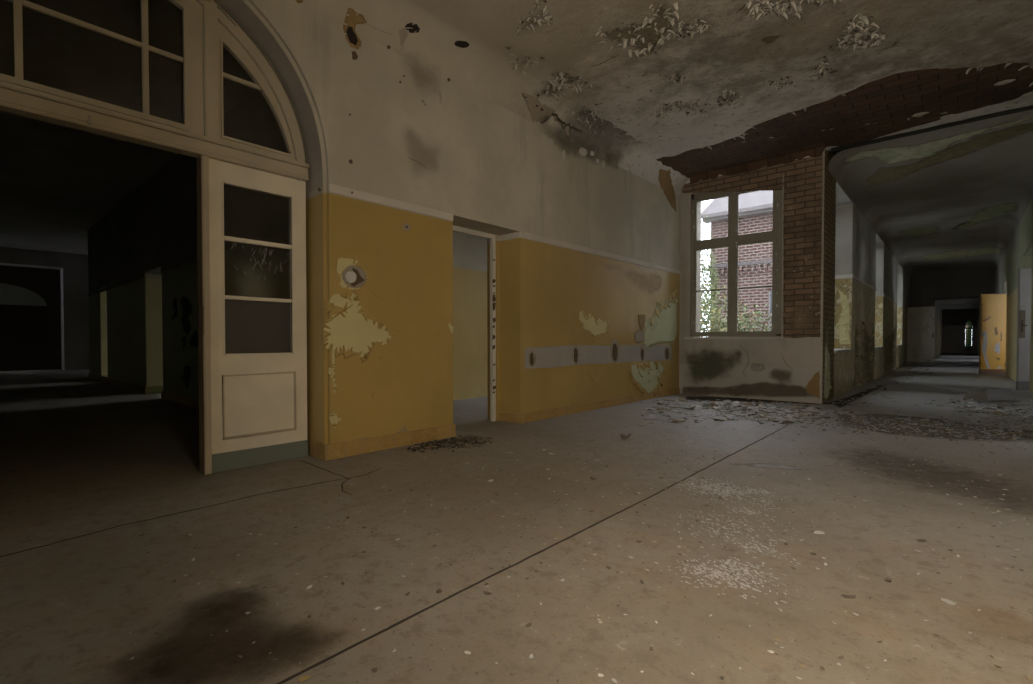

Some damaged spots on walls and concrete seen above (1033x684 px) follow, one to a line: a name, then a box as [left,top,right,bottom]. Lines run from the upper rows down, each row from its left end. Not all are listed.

flaking render [343,8,367,60]
peeling [596,2,711,61]
peeling [746,0,841,22]
peeling [813,14,897,81]
damp [549,111,632,169]
flaking render [650,62,1033,338]
peeling [323,257,391,395]
flaking render [525,289,678,399]
peeling [836,290,898,387]
peeling [982,331,1002,369]
damp [683,350,1033,441]